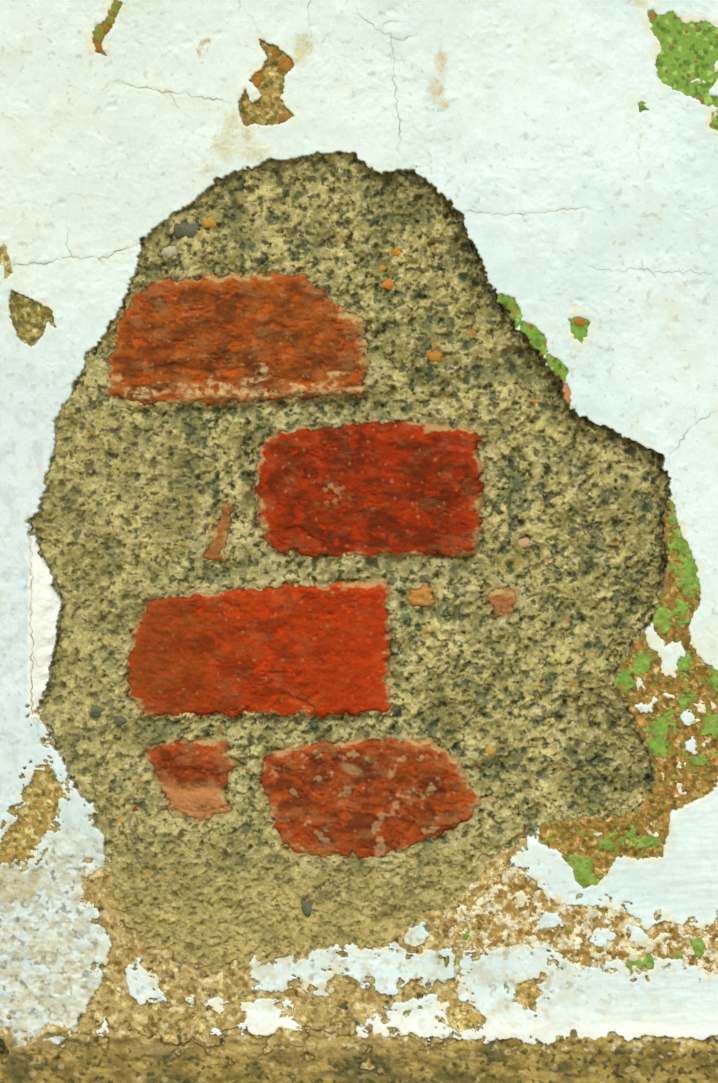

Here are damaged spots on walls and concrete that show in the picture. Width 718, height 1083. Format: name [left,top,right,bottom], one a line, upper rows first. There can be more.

peeling [92,1,122,56]
crack [123,82,230,106]
peeling [239,40,294,126]
crack [362,17,407,152]
peeling [648,10,718,131]
crack [465,207,583,223]
peeling [0,245,12,279]
crack [0,232,135,266]
peeling [10,291,54,345]
spalling [32,153,718,1058]
peeling [0,756,70,873]
peeling [360,1047,375,1071]